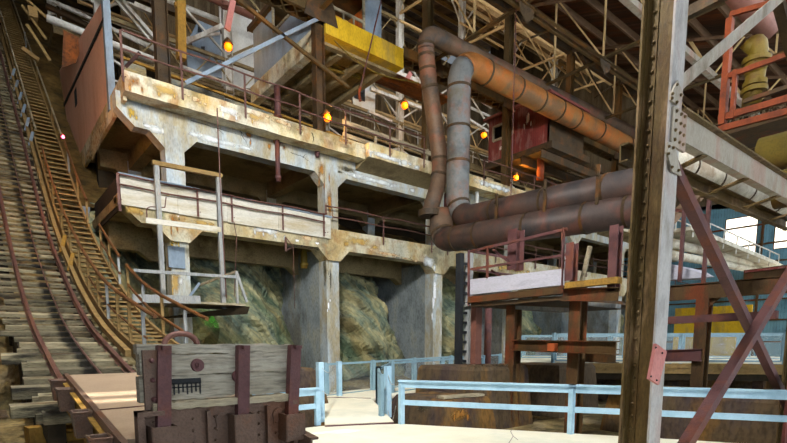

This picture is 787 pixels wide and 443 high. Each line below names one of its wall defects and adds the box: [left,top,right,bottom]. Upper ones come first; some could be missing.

efflorescence [191,133,250,150]